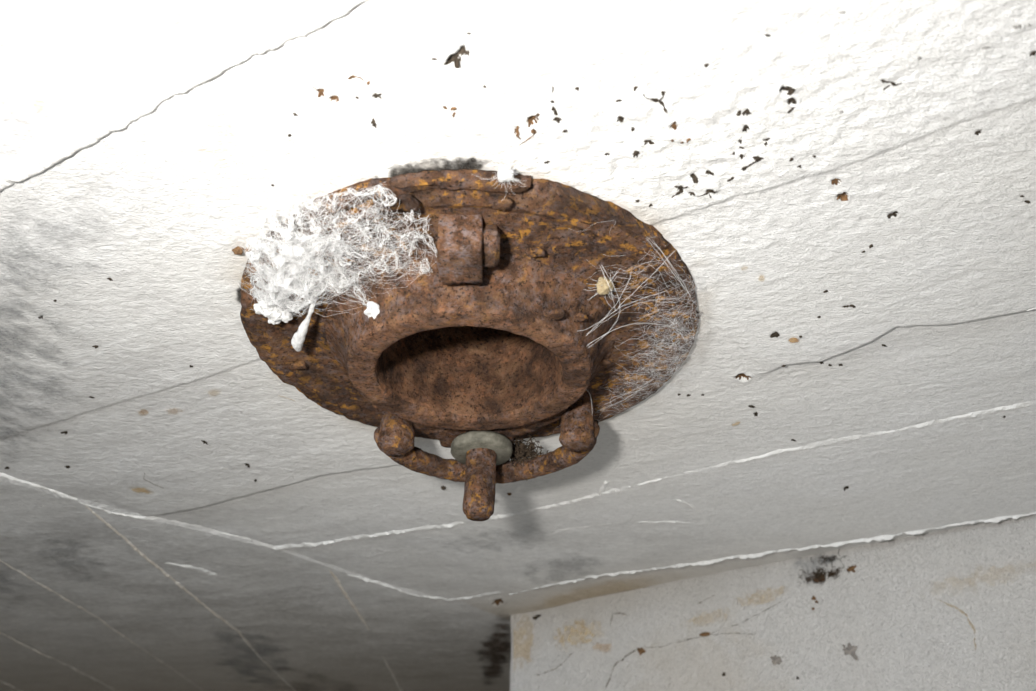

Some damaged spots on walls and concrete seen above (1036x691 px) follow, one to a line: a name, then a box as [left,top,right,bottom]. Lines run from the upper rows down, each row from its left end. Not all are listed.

corrosion [390,194,420,213]
crack [604,597,790,690]